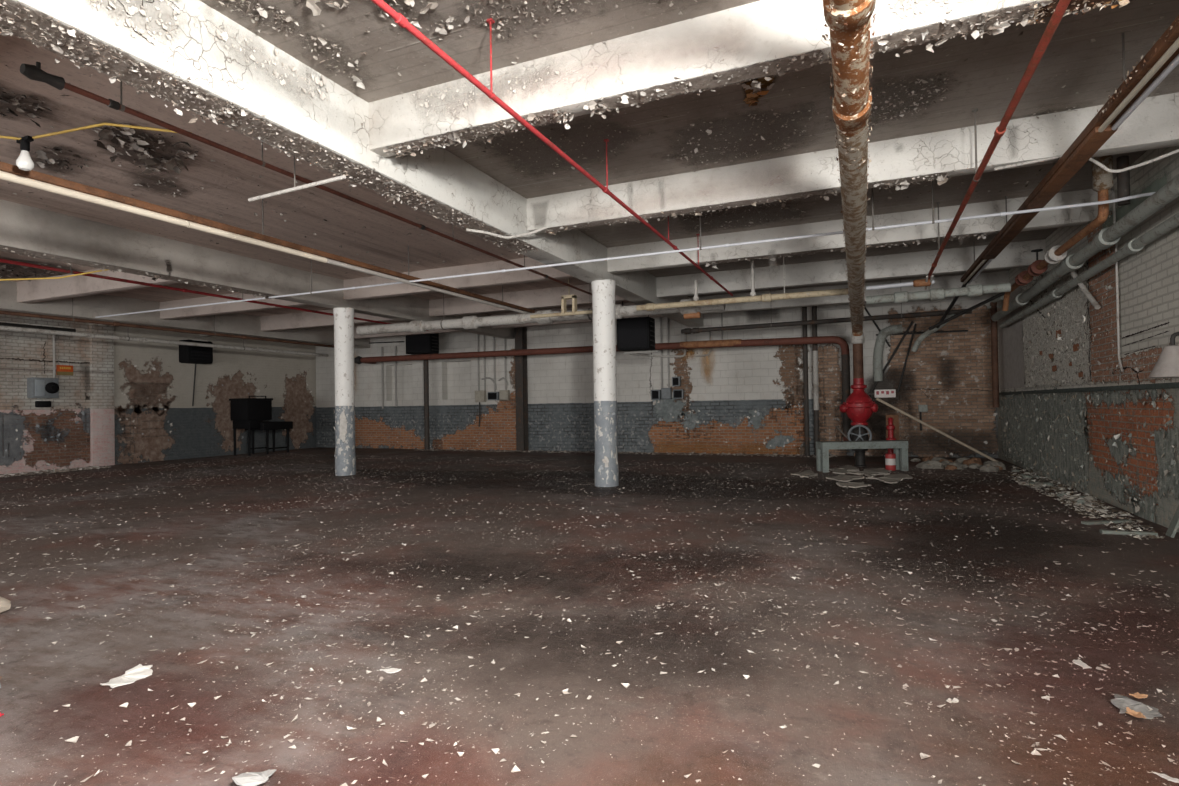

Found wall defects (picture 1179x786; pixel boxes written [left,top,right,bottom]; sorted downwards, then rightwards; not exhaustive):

crack [118,0,179,44]
peeling [0,0,538,265]
peeling [369,0,1131,327]
peeling [114,358,176,464]
peeling [205,370,267,453]
peeling [278,369,315,449]
peeling [334,348,516,468]
peeling [648,343,888,456]
peeling [884,211,1179,523]